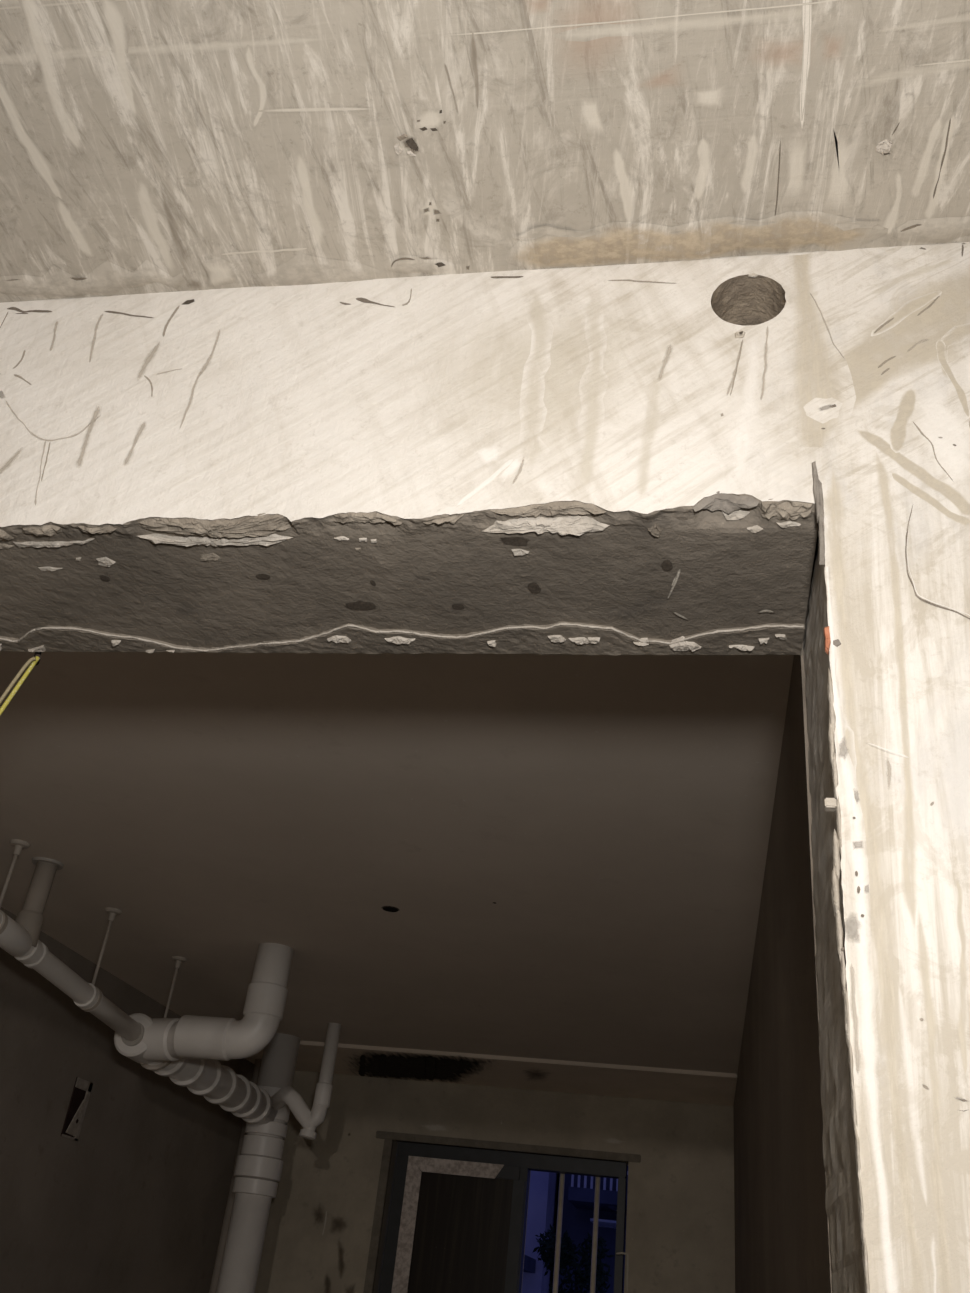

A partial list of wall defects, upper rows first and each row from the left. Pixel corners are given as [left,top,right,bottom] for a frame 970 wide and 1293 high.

spalling [0,525,117,581]
spalling [138,513,293,562]
spalling [333,512,402,552]
spalling [423,513,465,526]
spalling [483,501,610,556]
crack [905,501,970,619]
flaking render [0,601,804,653]
flaking render [693,461,902,1293]